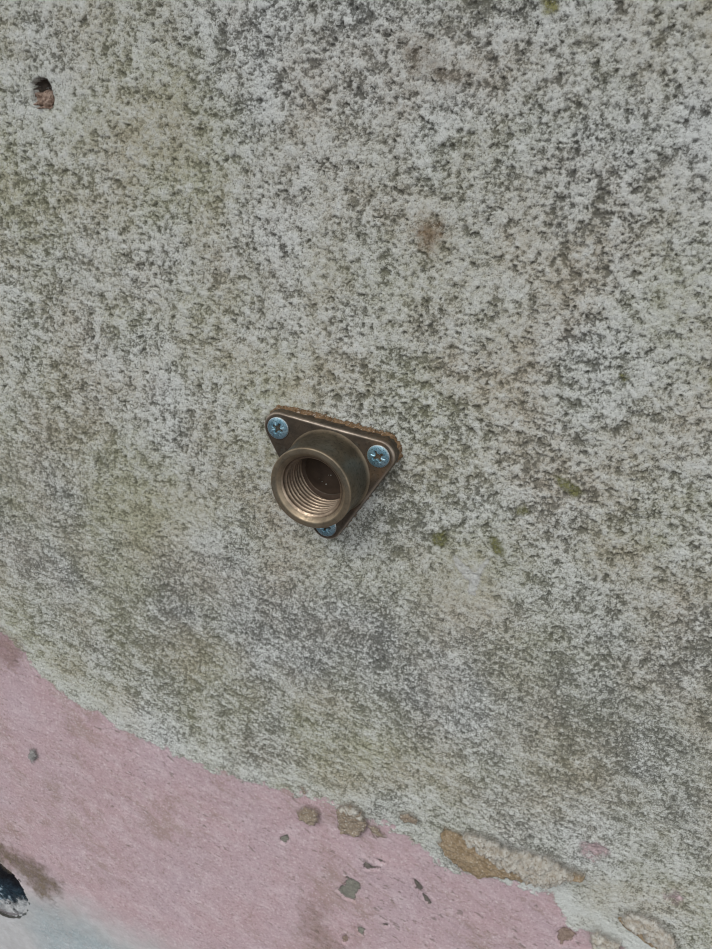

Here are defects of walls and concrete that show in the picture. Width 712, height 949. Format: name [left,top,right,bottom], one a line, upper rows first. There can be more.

leakage [0,844,57,896]
peeling [338,876,361,899]
peeling [557,927,576,944]